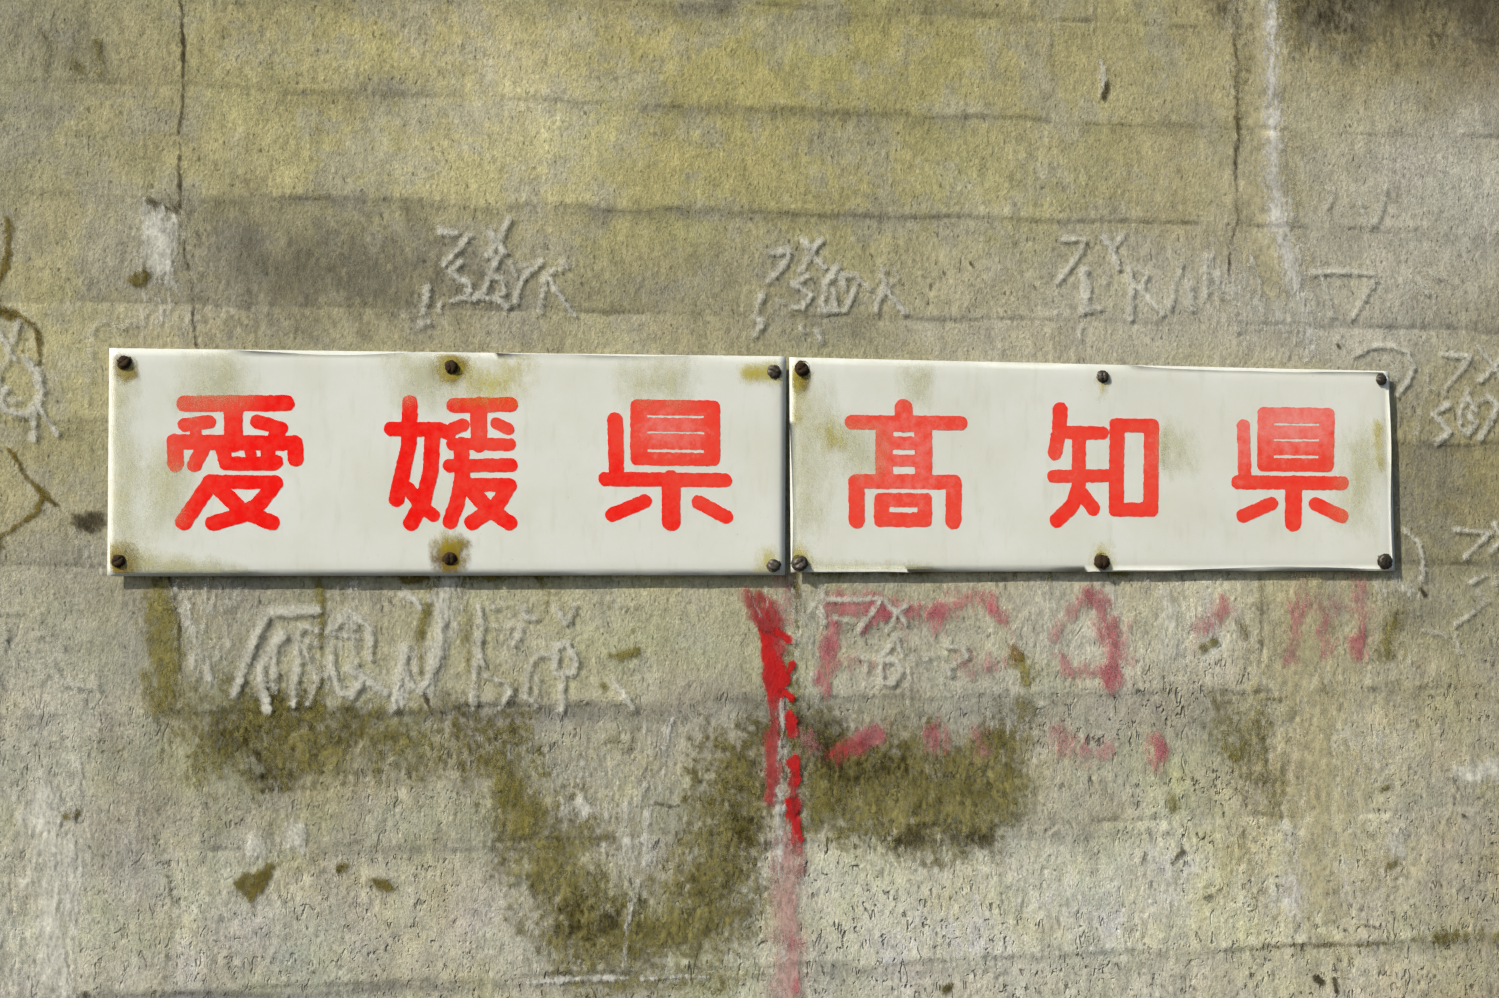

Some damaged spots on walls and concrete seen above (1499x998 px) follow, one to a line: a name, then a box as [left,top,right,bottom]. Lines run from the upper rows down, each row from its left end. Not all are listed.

crack [154,0,189,270]
crack [1227,6,1253,282]
leakage [1202,0,1499,361]
crack [0,217,43,365]
crack [190,307,198,346]
crack [0,447,57,548]
crack [167,576,181,668]
leakage [390,576,559,710]
leakage [233,818,305,907]
leakage [560,717,674,932]
leakage [743,572,869,998]
leakage [526,974,709,985]